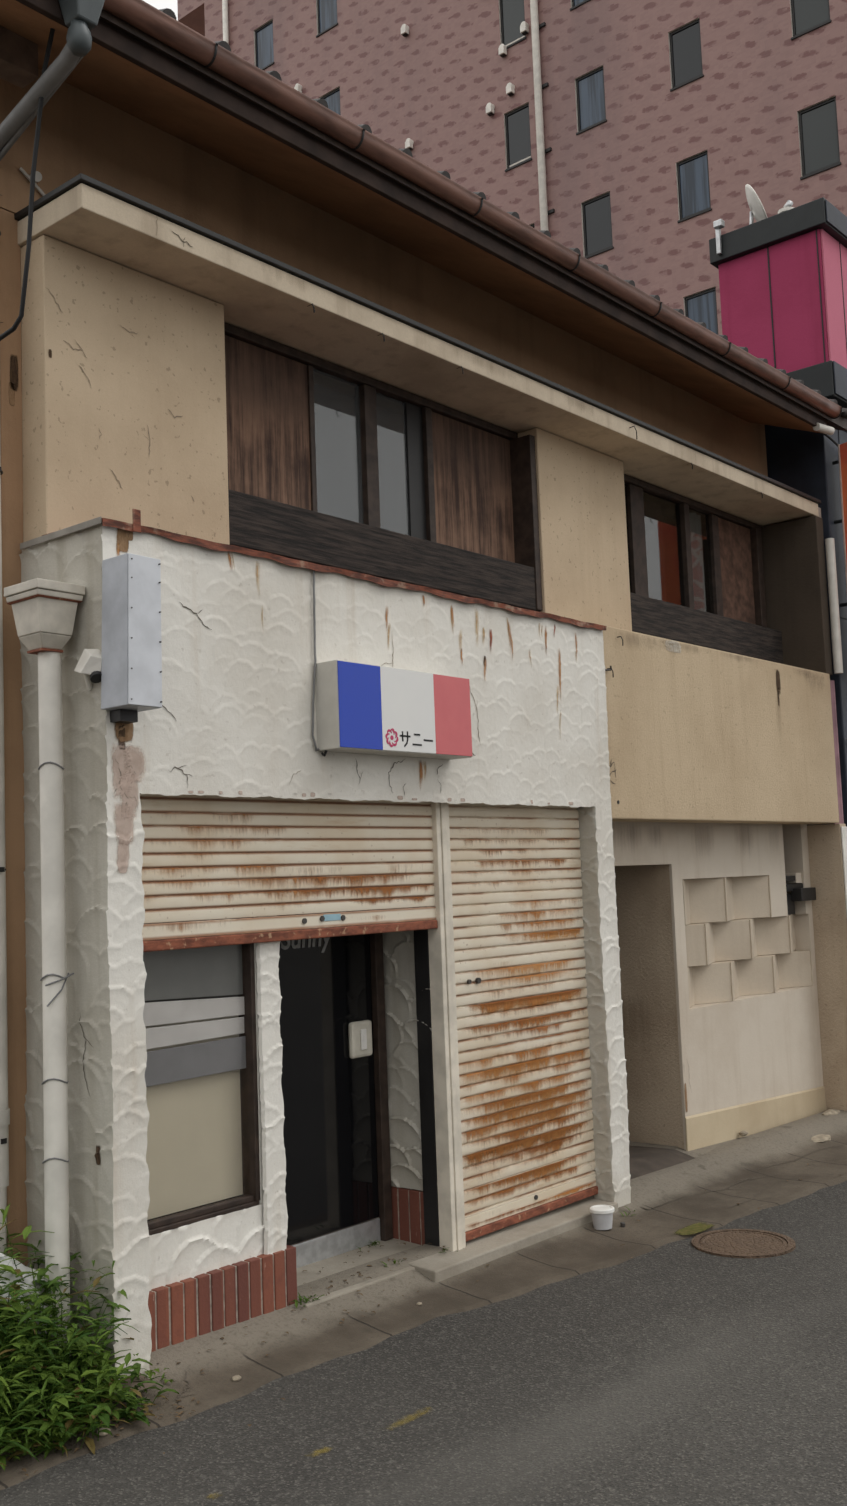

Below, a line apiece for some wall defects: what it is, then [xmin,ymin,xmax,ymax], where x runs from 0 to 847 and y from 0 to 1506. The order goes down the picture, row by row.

rust [476,620,513,675]
rust [530,625,577,705]
rust [167,813,279,897]
rust [232,866,427,906]
rust [504,901,580,940]
rust [465,960,592,1226]